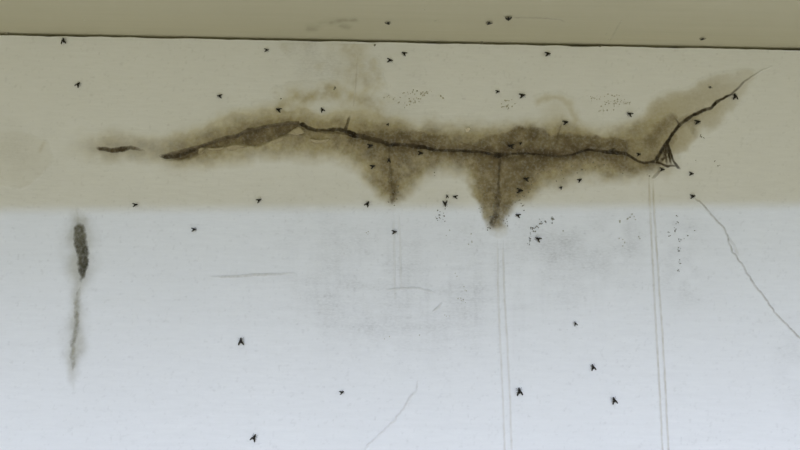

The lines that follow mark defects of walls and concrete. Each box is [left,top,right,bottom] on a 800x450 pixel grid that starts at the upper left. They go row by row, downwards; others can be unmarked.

flaking render [158,121,329,162]
crack [299,63,777,203]
leakage [53,43,757,450]
crack [693,197,800,339]